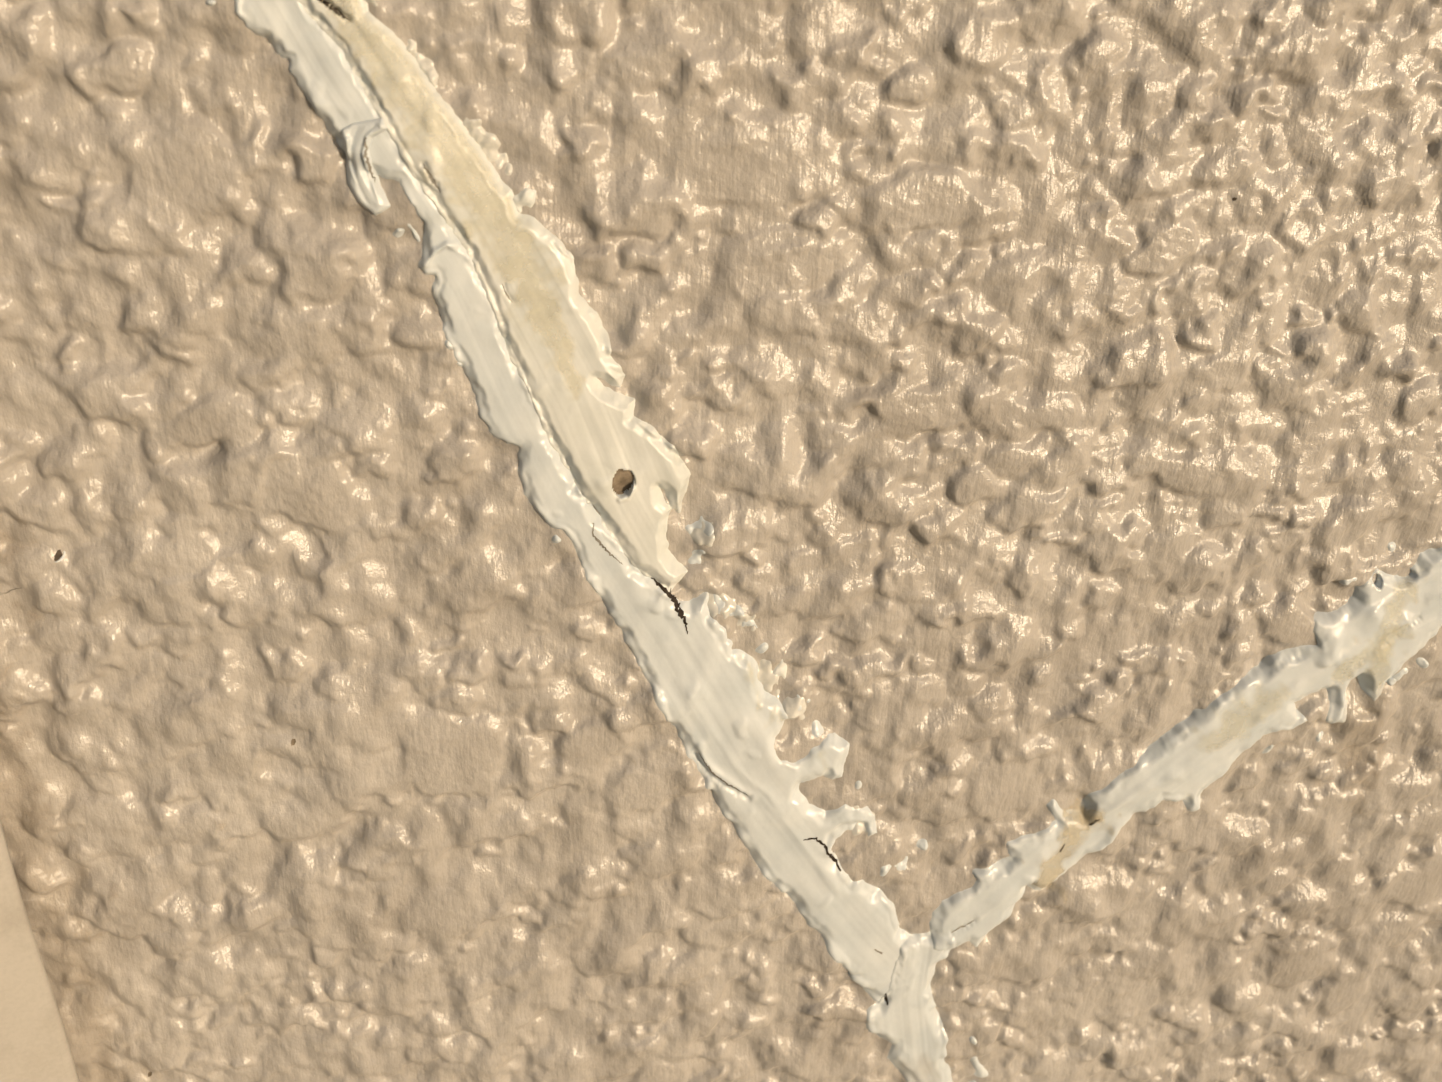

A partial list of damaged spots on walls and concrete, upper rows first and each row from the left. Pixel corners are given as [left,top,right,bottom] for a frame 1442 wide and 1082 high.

crack [206,0,216,8]
crack [234,0,911,1002]
crack [866,547,1442,1082]
crack [1387,542,1396,552]